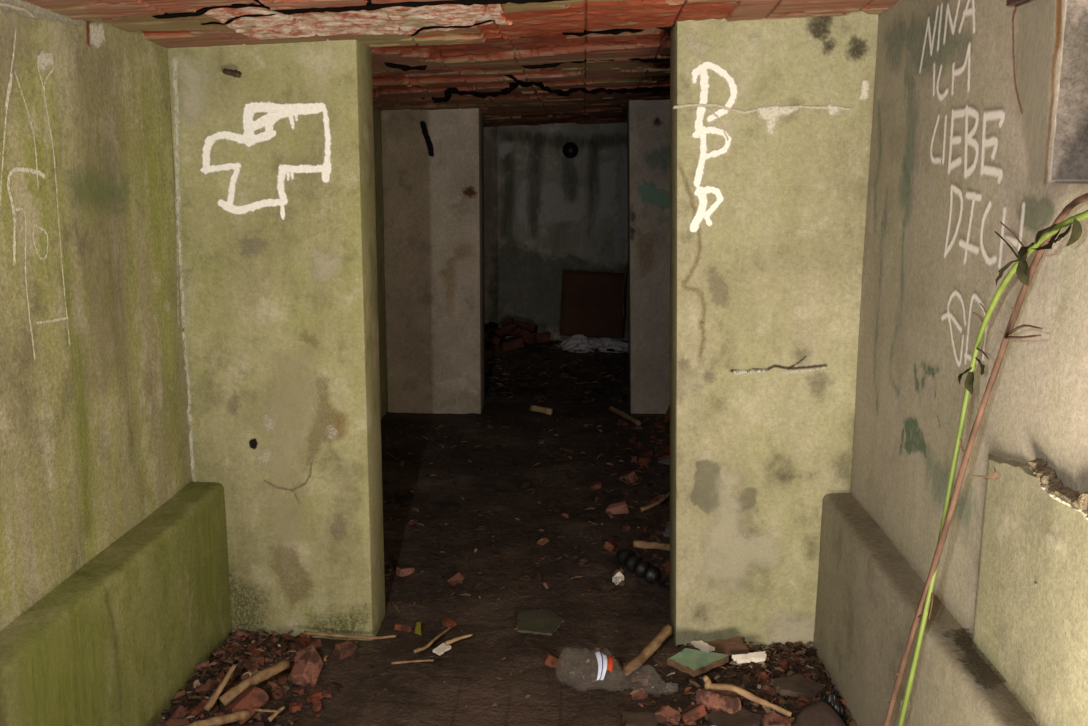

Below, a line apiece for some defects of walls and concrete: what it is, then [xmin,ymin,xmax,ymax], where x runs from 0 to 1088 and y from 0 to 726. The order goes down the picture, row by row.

water stain [89,23,105,48]
crack [152,0,567,36]
crack [384,62,427,71]
spalling [372,0,742,87]
crack [420,27,850,157]
water stain [808,16,834,50]
rust [1044,0,1061,184]
water stain [173,58,194,479]
water stain [900,419,926,457]
crack [264,464,312,503]
spalling [1027,458,1088,520]
water stain [691,461,781,590]